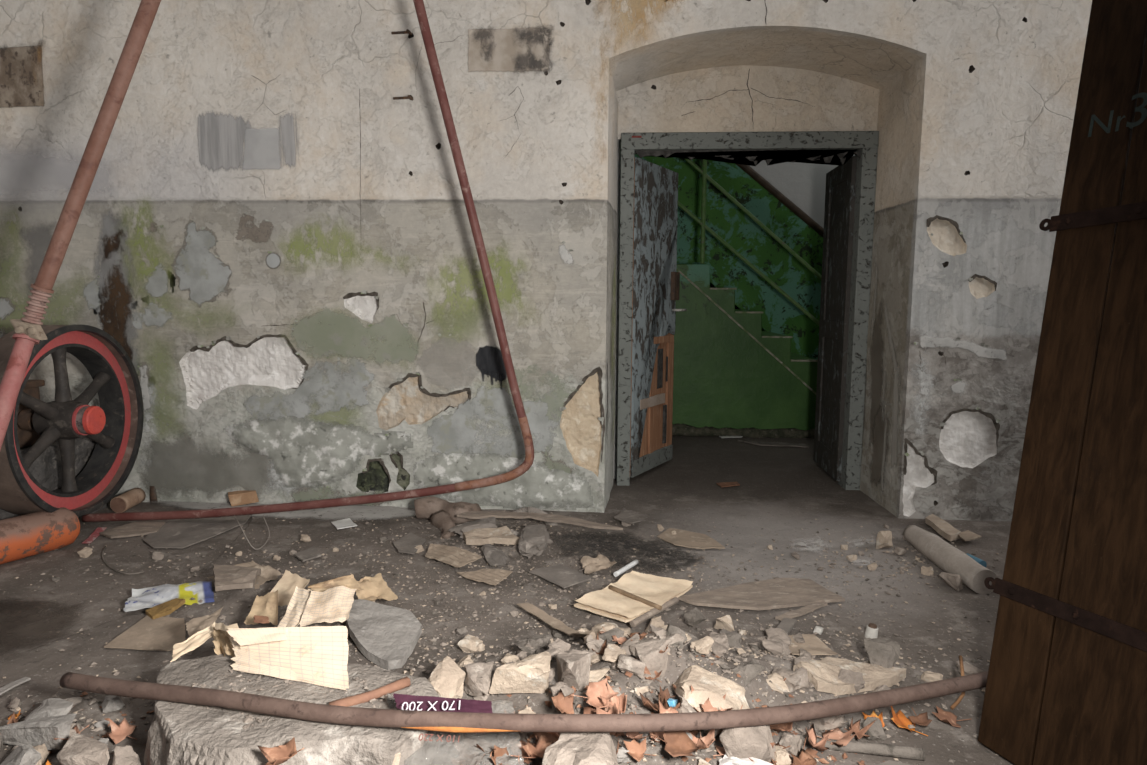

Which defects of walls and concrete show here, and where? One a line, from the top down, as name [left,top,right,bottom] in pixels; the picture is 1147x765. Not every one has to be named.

spalling [926,215,967,268]
damp [95,214,141,376]
peeling [132,220,232,329]
spalling [343,290,380,323]
spalling [968,274,997,299]
peeling [914,335,1007,360]
spalling [179,334,604,477]
peeling [869,267,938,517]
spalling [939,407,1000,468]
spalling [291,448,410,506]
damp [158,501,416,519]